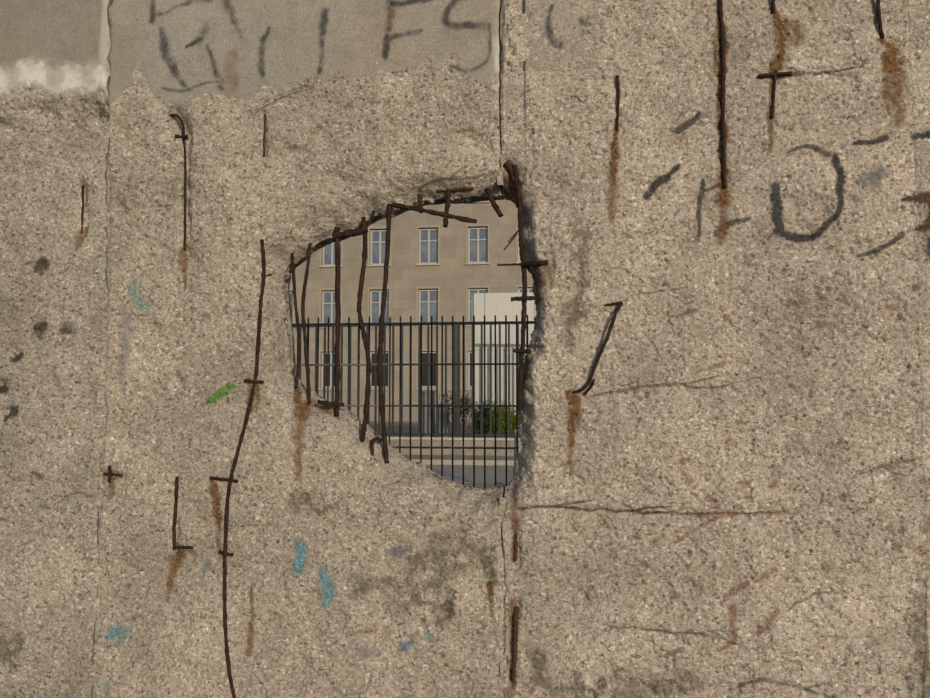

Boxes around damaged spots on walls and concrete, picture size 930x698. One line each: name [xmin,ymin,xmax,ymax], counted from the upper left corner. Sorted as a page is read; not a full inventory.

water stain [0,59,111,101]
rust [766,8,804,153]
rust [879,38,906,124]
rust [713,9,731,245]
rust [608,127,619,223]
spalling [0,54,504,698]
rust [293,386,332,481]
rust [566,390,581,476]
rust [208,480,222,556]
rust [511,485,519,562]
crack [567,500,671,515]
rust [167,543,198,599]